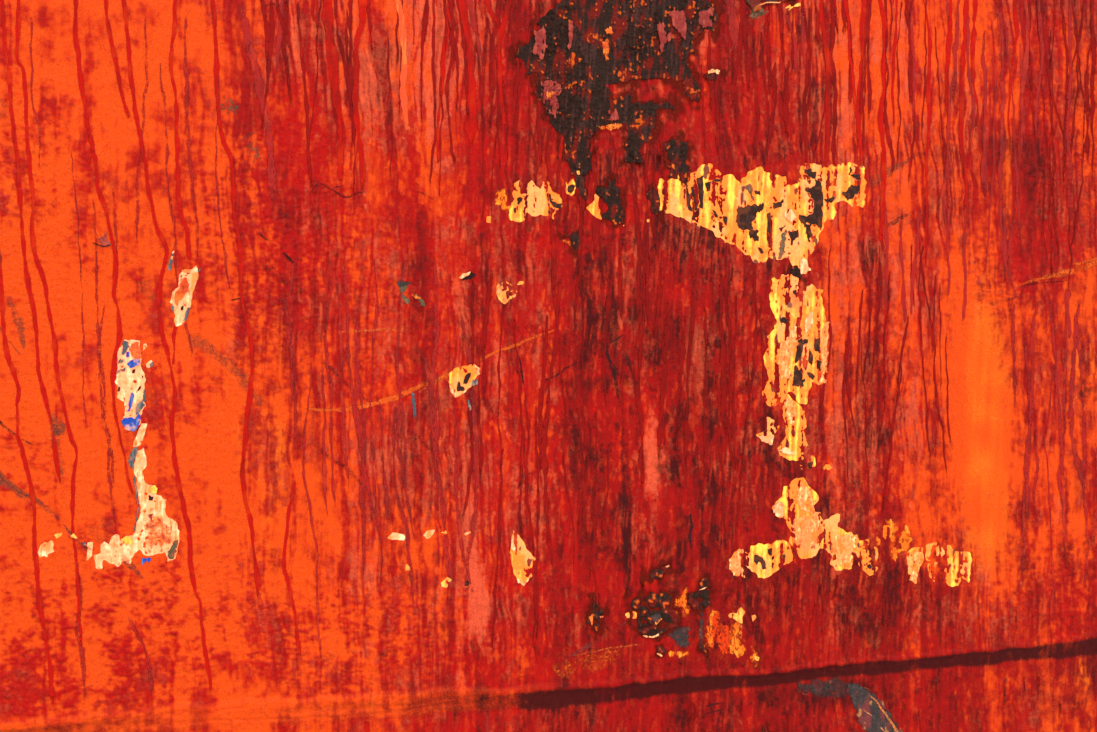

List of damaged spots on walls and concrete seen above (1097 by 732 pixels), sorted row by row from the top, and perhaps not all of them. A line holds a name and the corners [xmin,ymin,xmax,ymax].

corrosion [745,0,797,19]
corrosion [508,0,723,228]
peeling [495,179,580,257]
peeling [165,251,201,326]
peeling [449,364,480,398]
peeling [658,162,972,587]
peeling [38,340,179,569]
peeling [510,531,535,586]
corrosion [586,592,609,635]
corrosion [623,559,716,647]